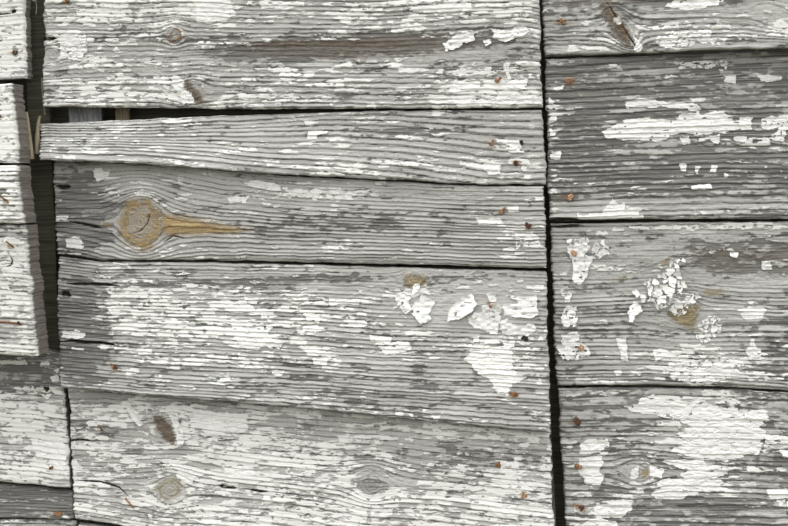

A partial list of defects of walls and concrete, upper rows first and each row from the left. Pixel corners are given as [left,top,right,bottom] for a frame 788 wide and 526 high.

peeling [443,25,529,51]
peeling [602,98,788,145]
peeling [679,163,729,178]
peeling [394,283,435,325]
peeling [556,237,610,360]
peeling [628,258,701,322]
peeling [696,315,722,343]
peeling [614,337,641,376]